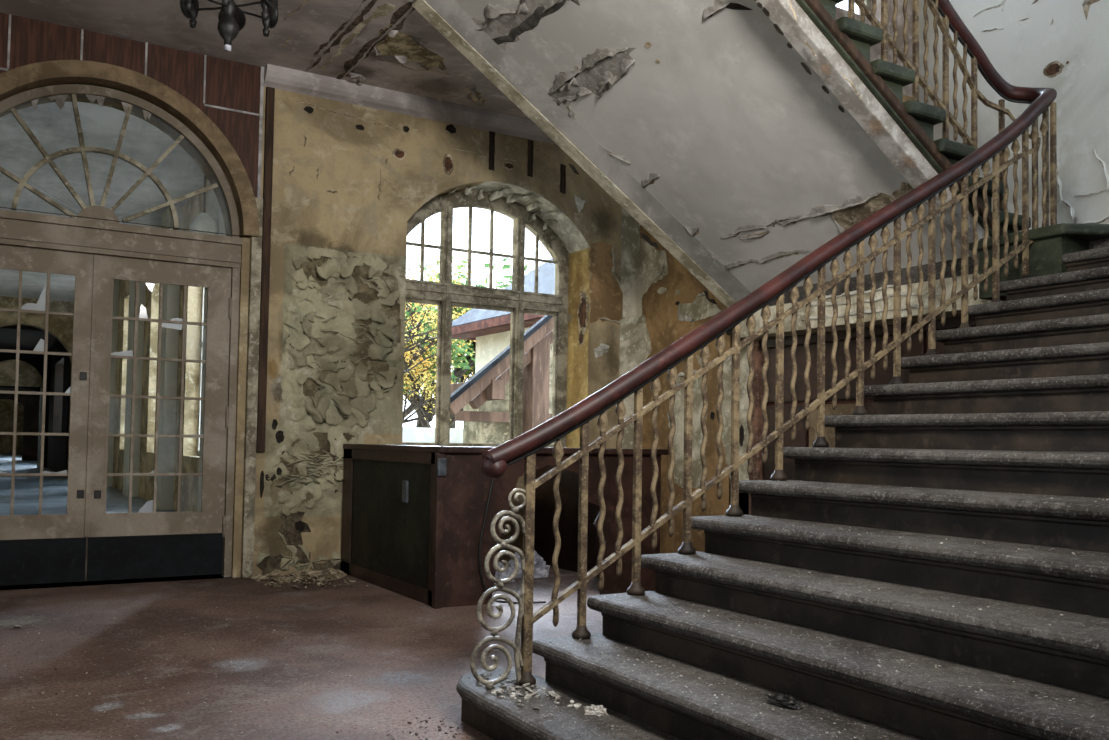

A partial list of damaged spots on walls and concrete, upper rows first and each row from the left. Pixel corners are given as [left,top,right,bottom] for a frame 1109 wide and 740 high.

flaking render [471,0,580,50]
peeling [702,0,793,49]
flaking render [548,42,652,104]
spalling [1046,61,1069,75]
peeling [577,232,722,366]
flaking render [272,419,284,443]
flaking render [260,467,282,498]